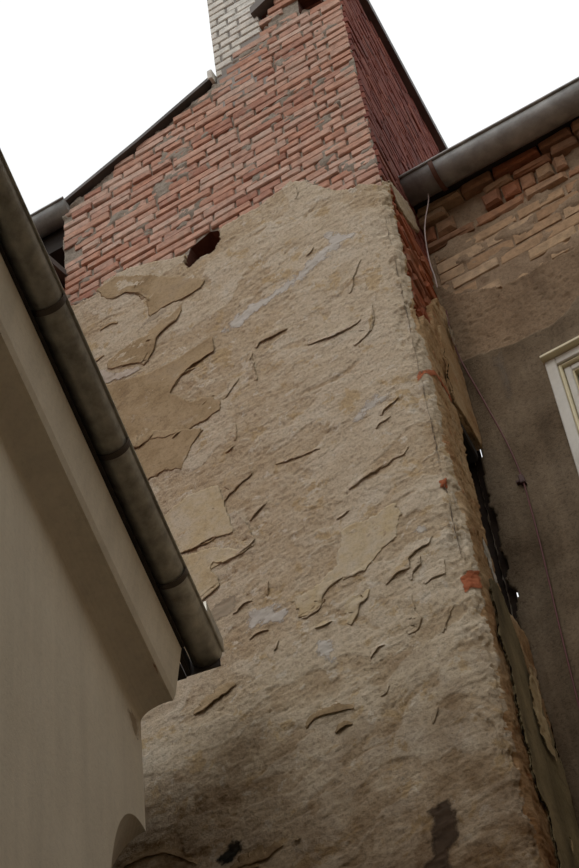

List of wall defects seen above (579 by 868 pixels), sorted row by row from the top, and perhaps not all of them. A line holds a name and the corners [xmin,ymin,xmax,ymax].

peeling [95,231,355,479]
flaking render [388,180,483,449]
peeling [211,503,402,640]
peeling [384,525,446,584]
flaking render [460,537,498,592]
peeling [305,701,354,733]
flaking render [529,668,557,761]
leakage [424,800,459,868]